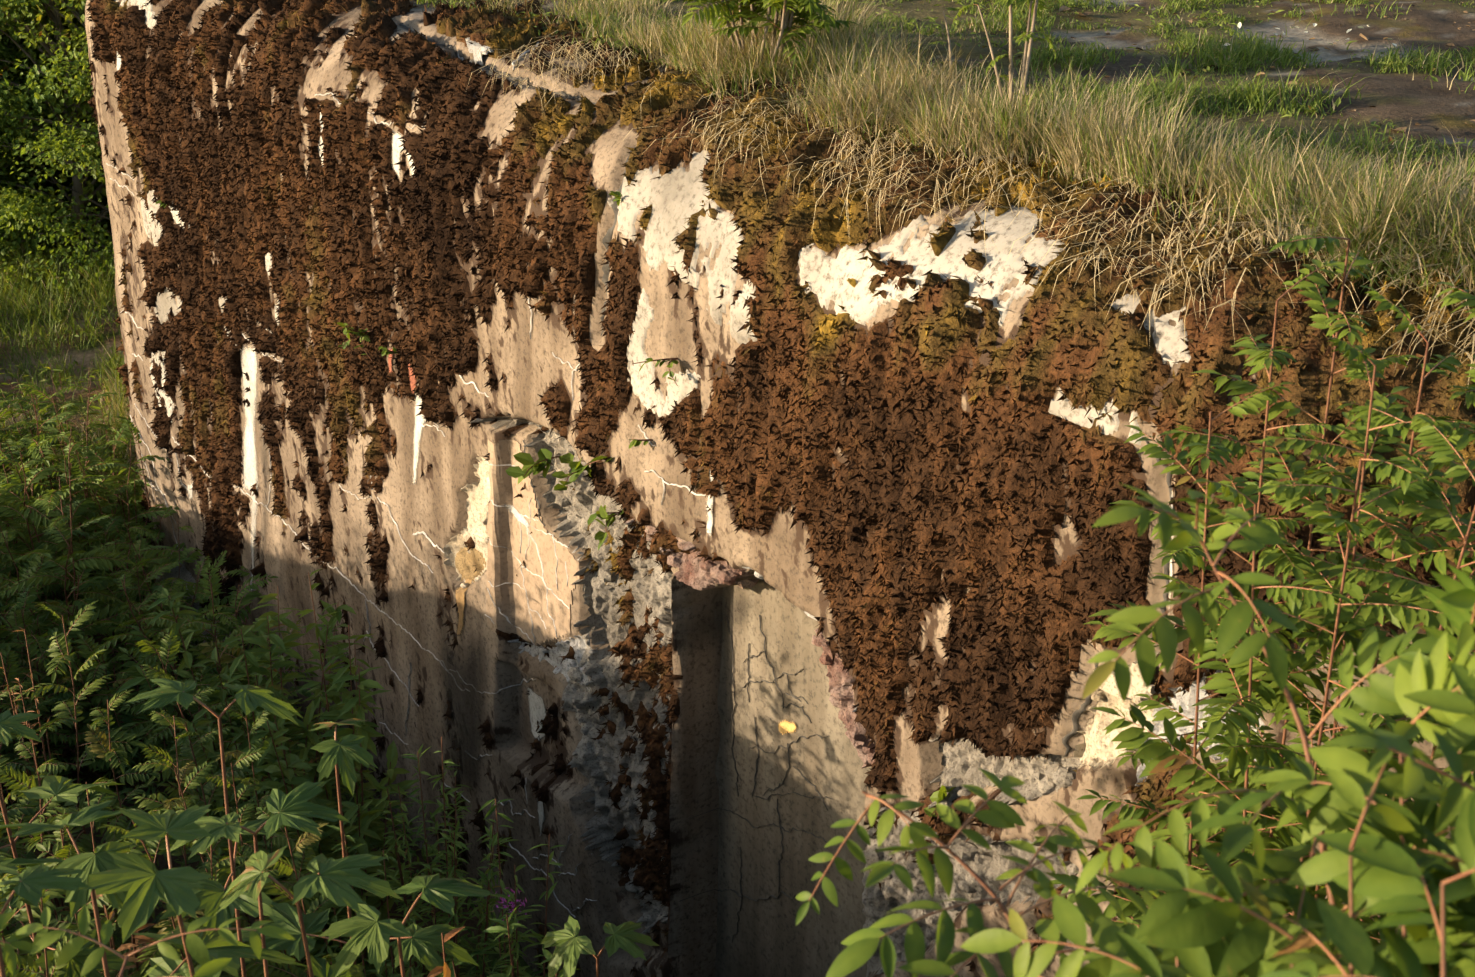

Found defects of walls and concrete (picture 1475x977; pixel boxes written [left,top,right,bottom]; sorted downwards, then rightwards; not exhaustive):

crack [130,404,447,745]
spalling [443,455,490,588]
crack [444,778,597,918]
crack [476,439,584,694]
spalling [470,416,764,933]
crack [679,615,832,943]